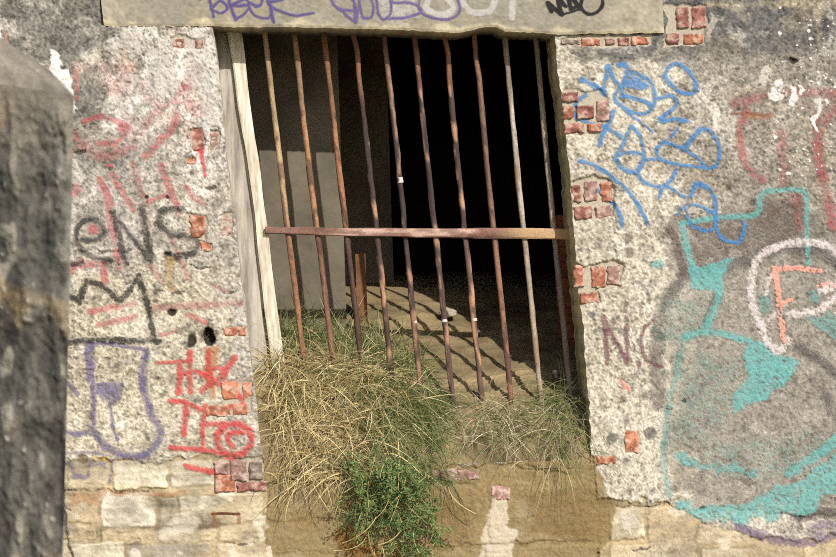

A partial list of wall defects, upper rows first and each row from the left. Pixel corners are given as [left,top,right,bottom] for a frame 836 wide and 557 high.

spalling [560,34,652,49]
spalling [663,3,708,48]
peeling [49,49,76,111]
spalling [560,88,610,137]
spalling [570,175,615,223]
spalling [210,457,268,493]